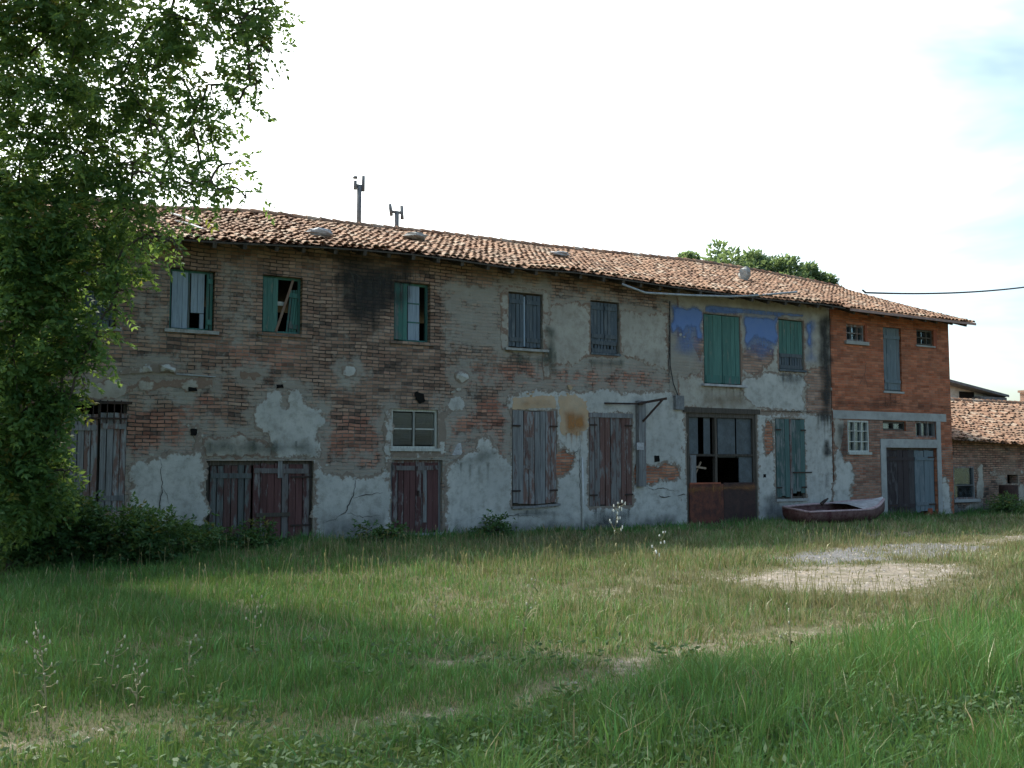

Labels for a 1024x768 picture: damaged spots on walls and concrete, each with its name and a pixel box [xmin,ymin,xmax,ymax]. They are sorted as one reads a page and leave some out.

peeling [79,372,213,400]
peeling [124,285,811,540]
crack [337,481,379,518]